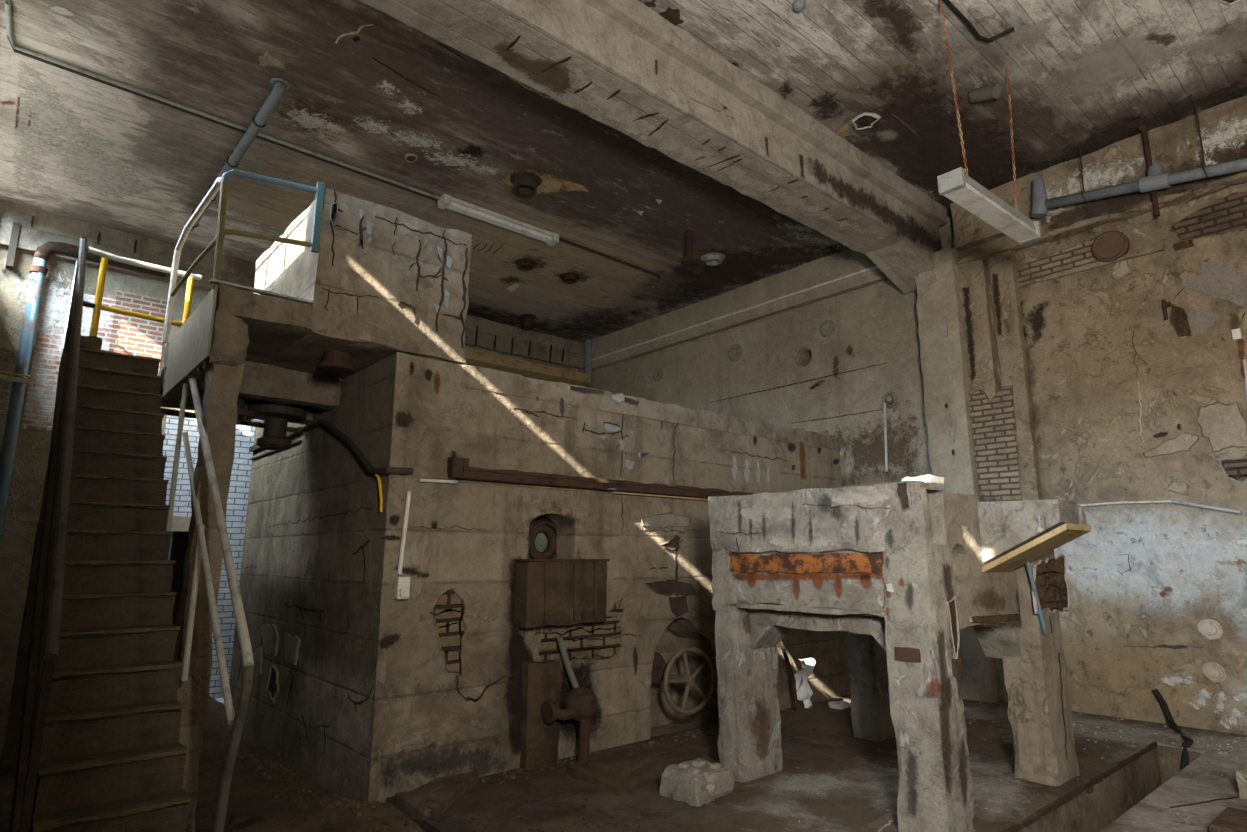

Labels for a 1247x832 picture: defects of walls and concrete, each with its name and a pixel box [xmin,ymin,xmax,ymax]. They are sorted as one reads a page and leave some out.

water stain [1032,22,1247,243]
crack [322,187,564,362]
flaking render [1016,236,1098,283]
flaking render [1168,191,1247,251]
flaking render [969,385,1022,501]
flaking render [1143,402,1247,485]
flaking render [431,587,466,676]
corrosion [733,572,904,616]